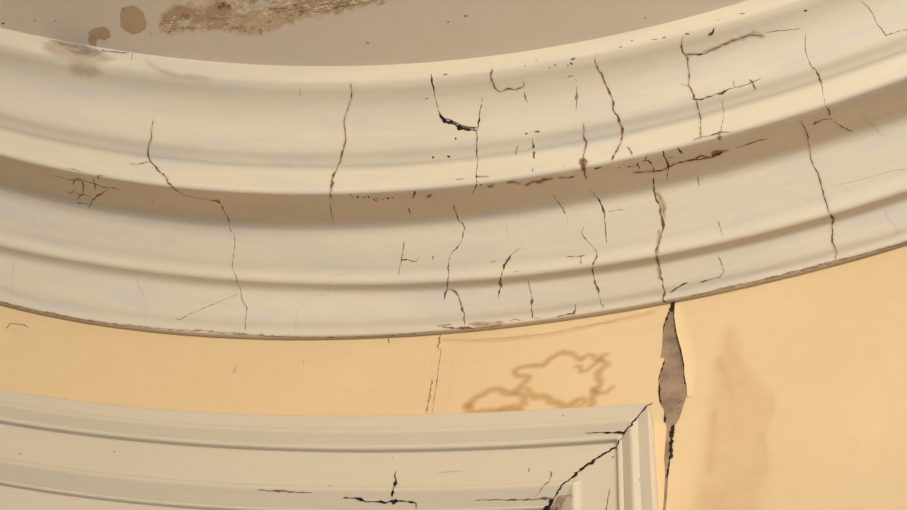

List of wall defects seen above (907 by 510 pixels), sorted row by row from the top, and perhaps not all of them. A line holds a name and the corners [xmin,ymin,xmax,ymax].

peeling [150,0,385,35]
crack [0,28,907,412]
crack [343,473,417,508]
crack [480,403,675,510]